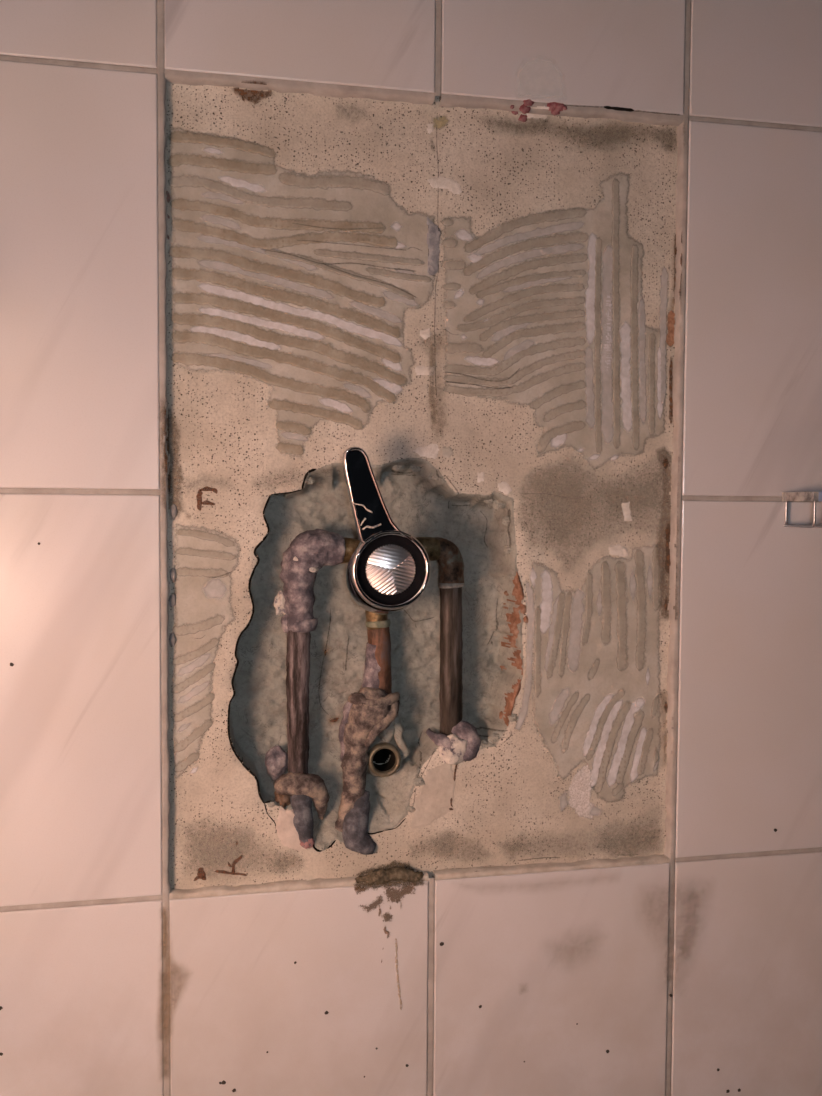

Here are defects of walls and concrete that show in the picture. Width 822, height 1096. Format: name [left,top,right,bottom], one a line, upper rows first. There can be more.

rust [234,81,271,103]
spalling [230,463,359,813]
spalling [308,563,368,851]
spalling [365,560,440,833]
spalling [371,458,528,749]